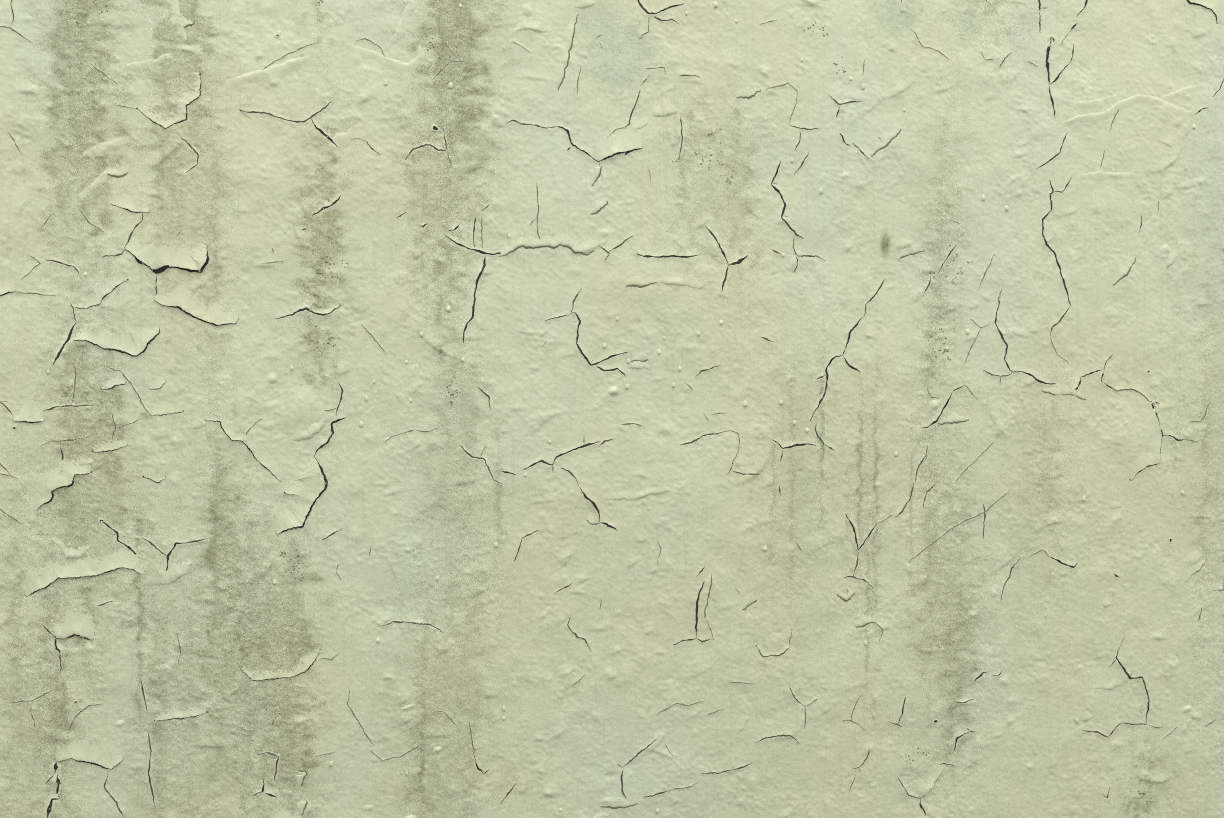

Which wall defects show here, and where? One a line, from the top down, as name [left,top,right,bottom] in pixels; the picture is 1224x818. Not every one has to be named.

crack [506,33,702,183]
peeling [593,126,643,161]
crack [597,59,869,294]
peeling [73,274,160,357]
peeling [100,196,239,326]
crack [395,203,507,345]
crack [541,286,629,379]
crack [841,0,1121,590]
peeling [205,381,349,534]
crack [383,420,644,536]
peeling [19,548,149,597]
peeling [241,648,341,681]